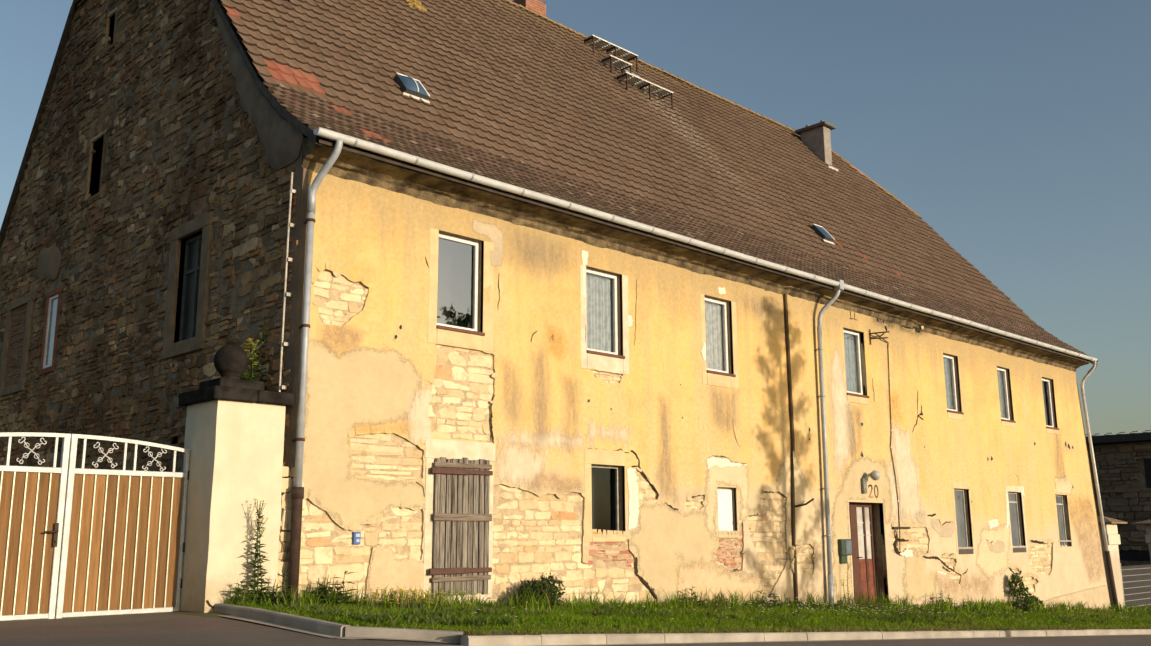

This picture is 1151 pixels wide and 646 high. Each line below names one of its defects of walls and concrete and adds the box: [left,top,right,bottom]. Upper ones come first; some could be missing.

flaking render [312,260,372,326]
flaking render [278,490,425,601]
flaking render [348,336,663,607]
flaking render [707,456,747,469]
flaking render [712,485,817,597]
flaking render [886,424,932,558]
crack [895,529,968,575]
flaking render [938,552,962,584]
flaking render [987,486,1053,593]